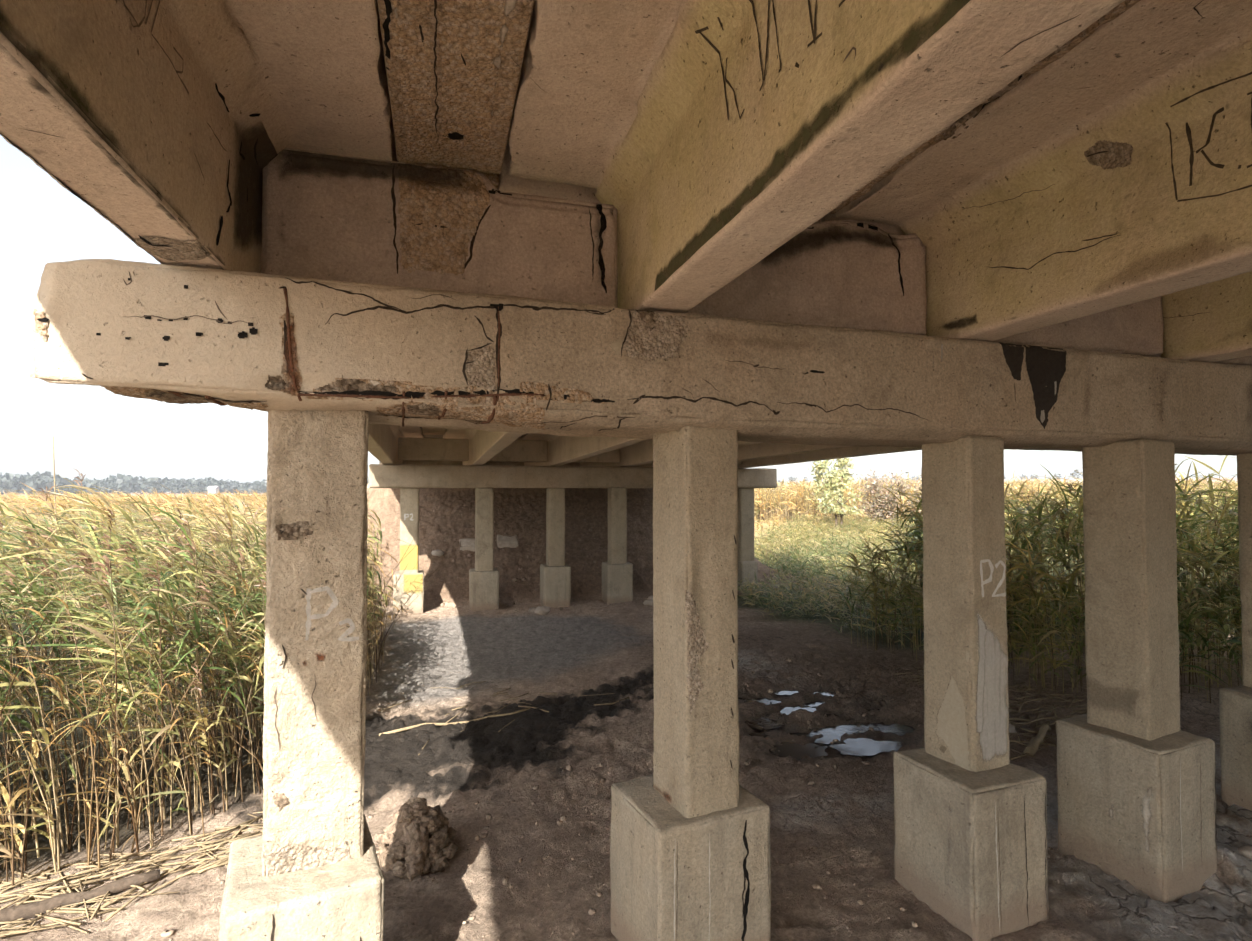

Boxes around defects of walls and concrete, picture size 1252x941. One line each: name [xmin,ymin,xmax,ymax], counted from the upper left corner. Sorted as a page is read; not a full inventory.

crack [382,0,466,144]
spalling [1084,140,1133,170]
crack [287,177,614,342]
rust [279,286,302,401]
spalling [101,313,635,430]
crack [560,360,927,431]
leakage [999,342,1067,429]
crack [672,841,680,941]
crack [706,833,714,933]
crack [741,820,770,941]